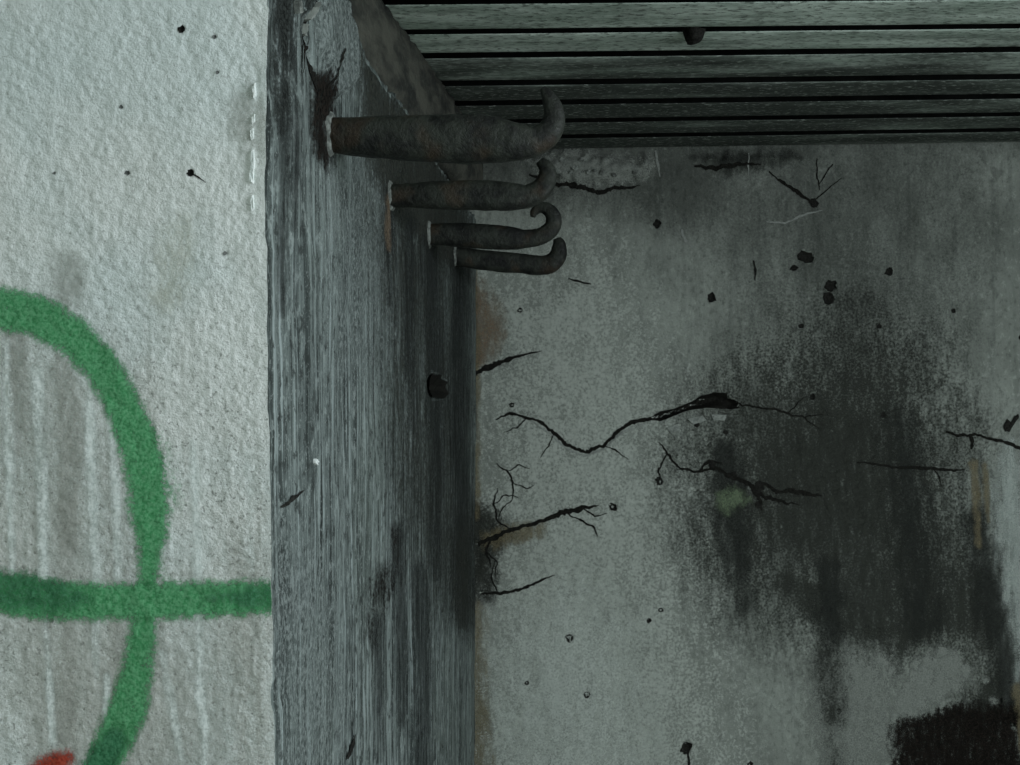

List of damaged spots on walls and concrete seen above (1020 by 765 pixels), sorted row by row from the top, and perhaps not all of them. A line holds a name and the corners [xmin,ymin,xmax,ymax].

crack [476,351,541,375]
crack [737,395,823,428]
crack [857,431,1020,486]
crack [477,412,822,595]